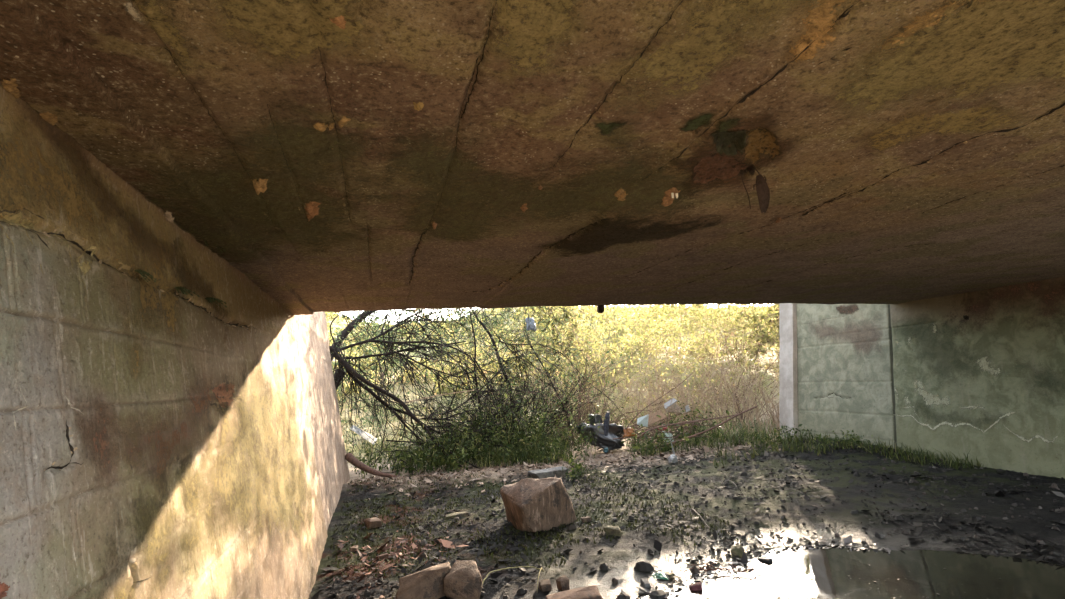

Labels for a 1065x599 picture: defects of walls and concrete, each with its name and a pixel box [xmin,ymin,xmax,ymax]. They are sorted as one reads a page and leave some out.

crack [447,0,498,176]
crack [549,0,683,167]
crack [407,201,439,283]
leakage [543,216,721,256]
crack [620,103,1065,279]
leakage [230,526,317,599]